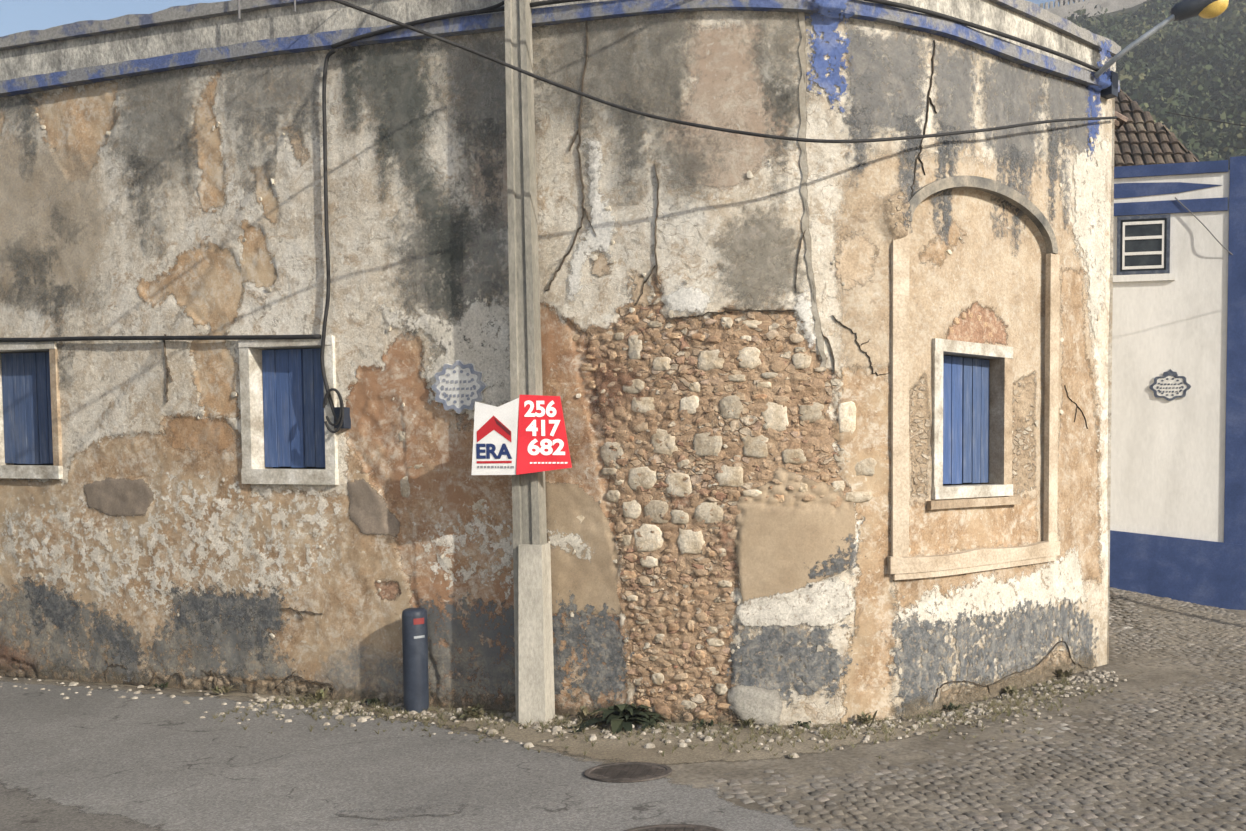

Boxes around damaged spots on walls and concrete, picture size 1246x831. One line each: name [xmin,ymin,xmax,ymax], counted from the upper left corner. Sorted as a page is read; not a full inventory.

water stain [116,66,204,254]
flaking render [187,66,228,217]
water stain [335,31,509,358]
crack [546,20,596,291]
crack [636,163,659,304]
crack [672,12,890,376]
peeling [803,0,857,113]
crack [911,40,937,197]
water stain [842,20,1093,258]
flaking render [0,161,516,709]
flaking render [540,152,1103,725]
water stain [0,602,404,704]